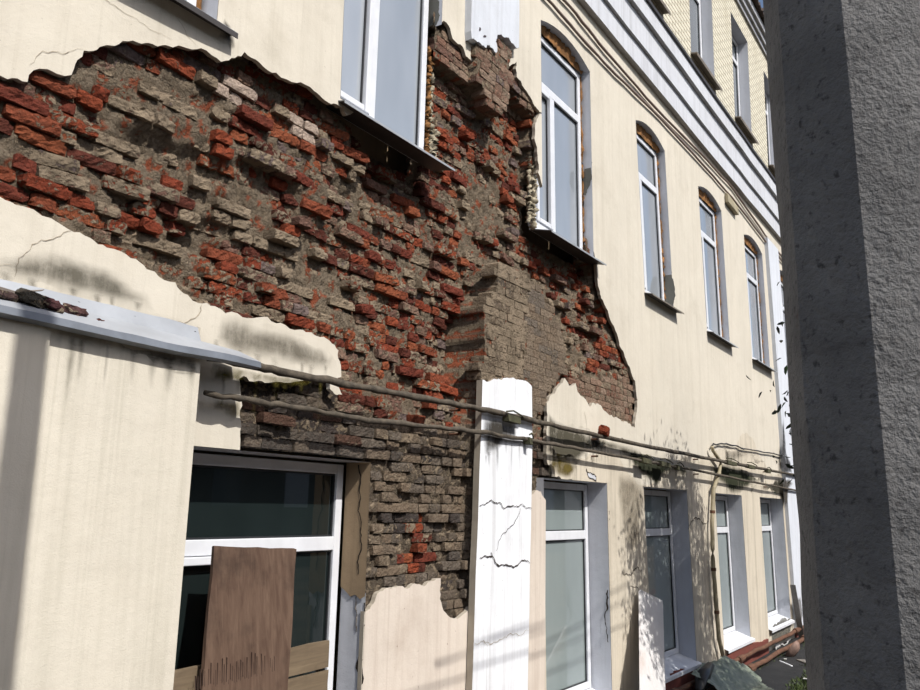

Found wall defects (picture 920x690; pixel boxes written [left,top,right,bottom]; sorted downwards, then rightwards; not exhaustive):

spalling [0,12,635,632]
damp [549,419,686,484]
damp [714,453,756,491]
damp [768,425,791,505]
crack [480,500,531,568]
damp [622,483,639,543]
crack [602,590,610,642]